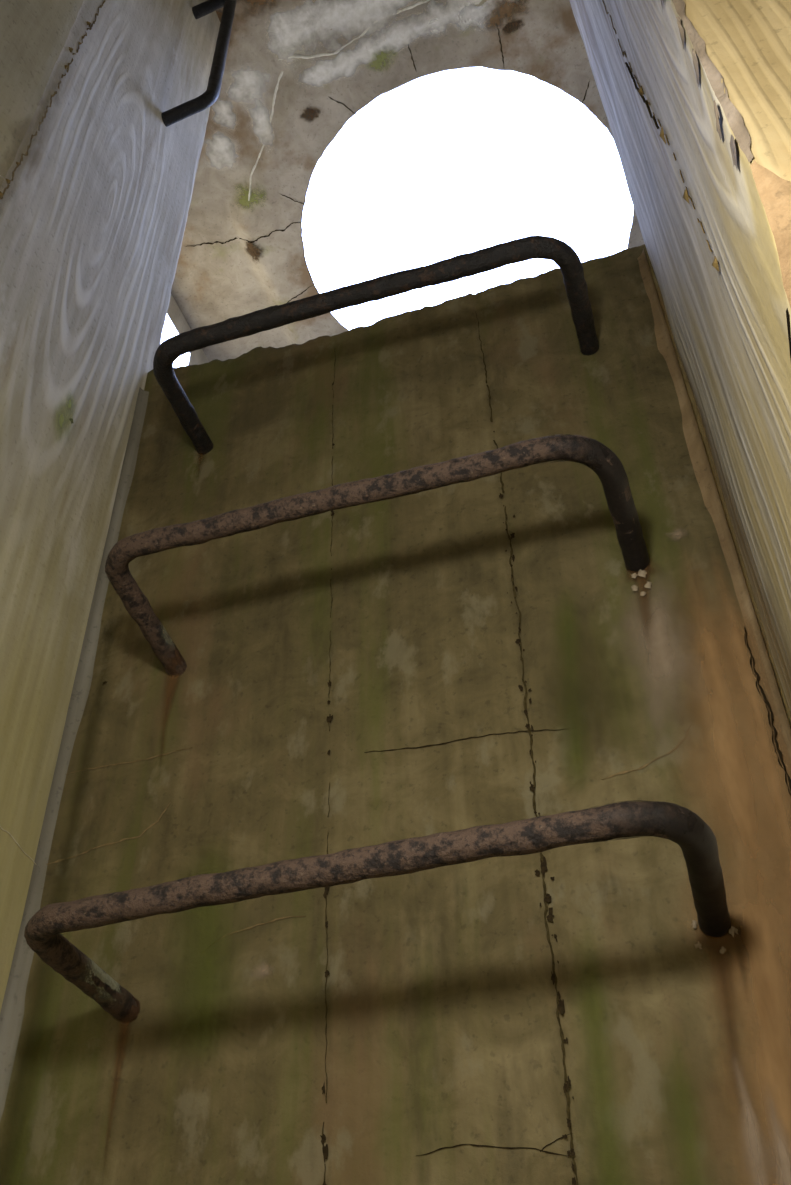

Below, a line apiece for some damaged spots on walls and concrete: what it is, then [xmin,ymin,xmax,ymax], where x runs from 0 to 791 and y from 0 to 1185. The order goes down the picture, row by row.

crack [186,194,309,247]
spalling [660,0,791,359]
crack [365,311,564,817]
crack [416,852,578,1185]
corrosion [694,596,791,1185]